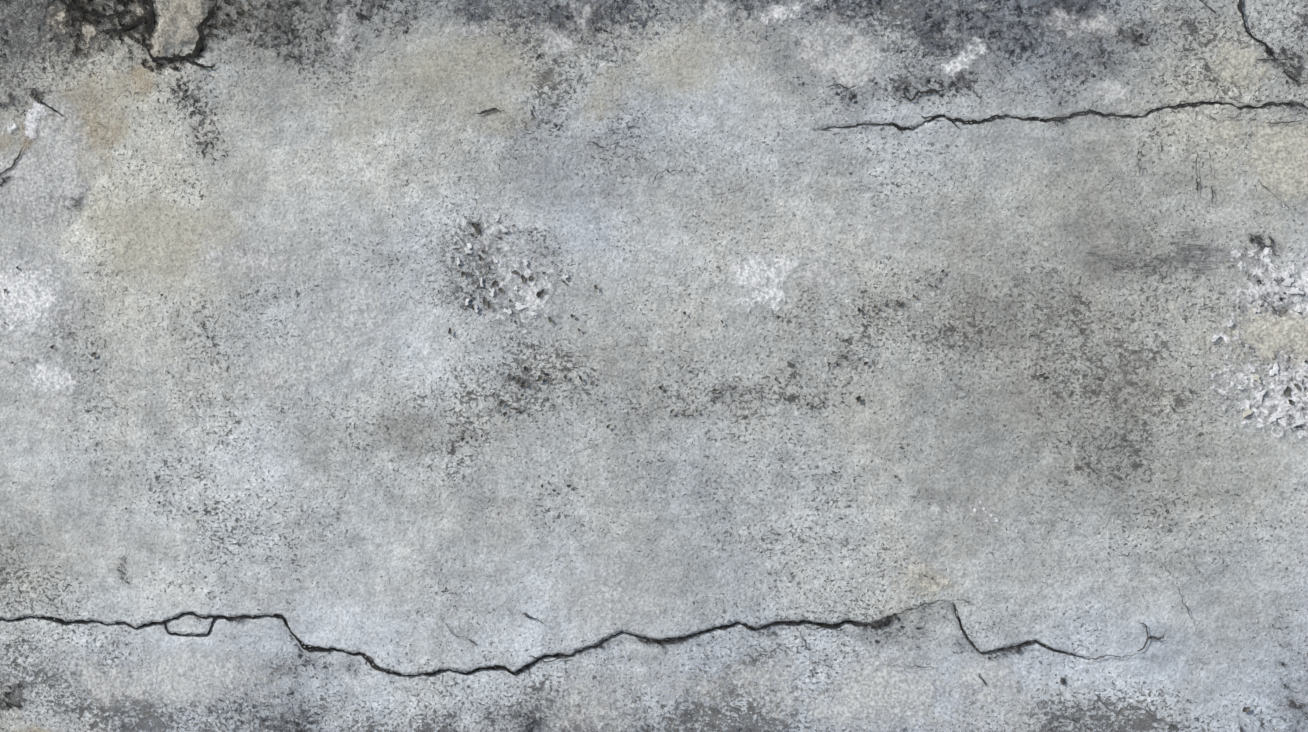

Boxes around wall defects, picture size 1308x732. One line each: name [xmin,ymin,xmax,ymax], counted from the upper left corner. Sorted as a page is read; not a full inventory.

water stain [0,0,106,115]
water stain [155,52,235,176]
water stain [230,0,430,90]
crack [814,0,1308,174]
crack [1196,152,1214,201]
peeling [1202,244,1308,442]
crack [1,564,1207,686]